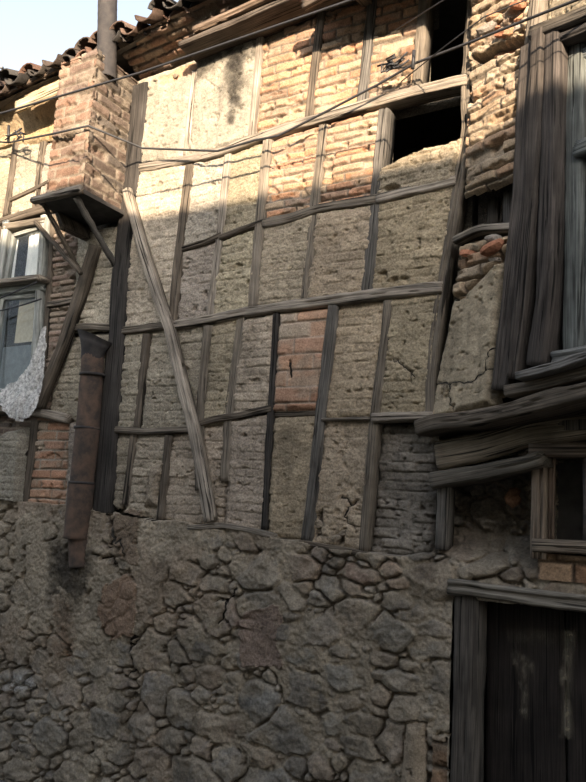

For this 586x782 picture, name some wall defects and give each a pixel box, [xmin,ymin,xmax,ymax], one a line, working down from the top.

spalling [476,0,527,43]
spalling [452,234,508,300]
crack [437,348,496,408]